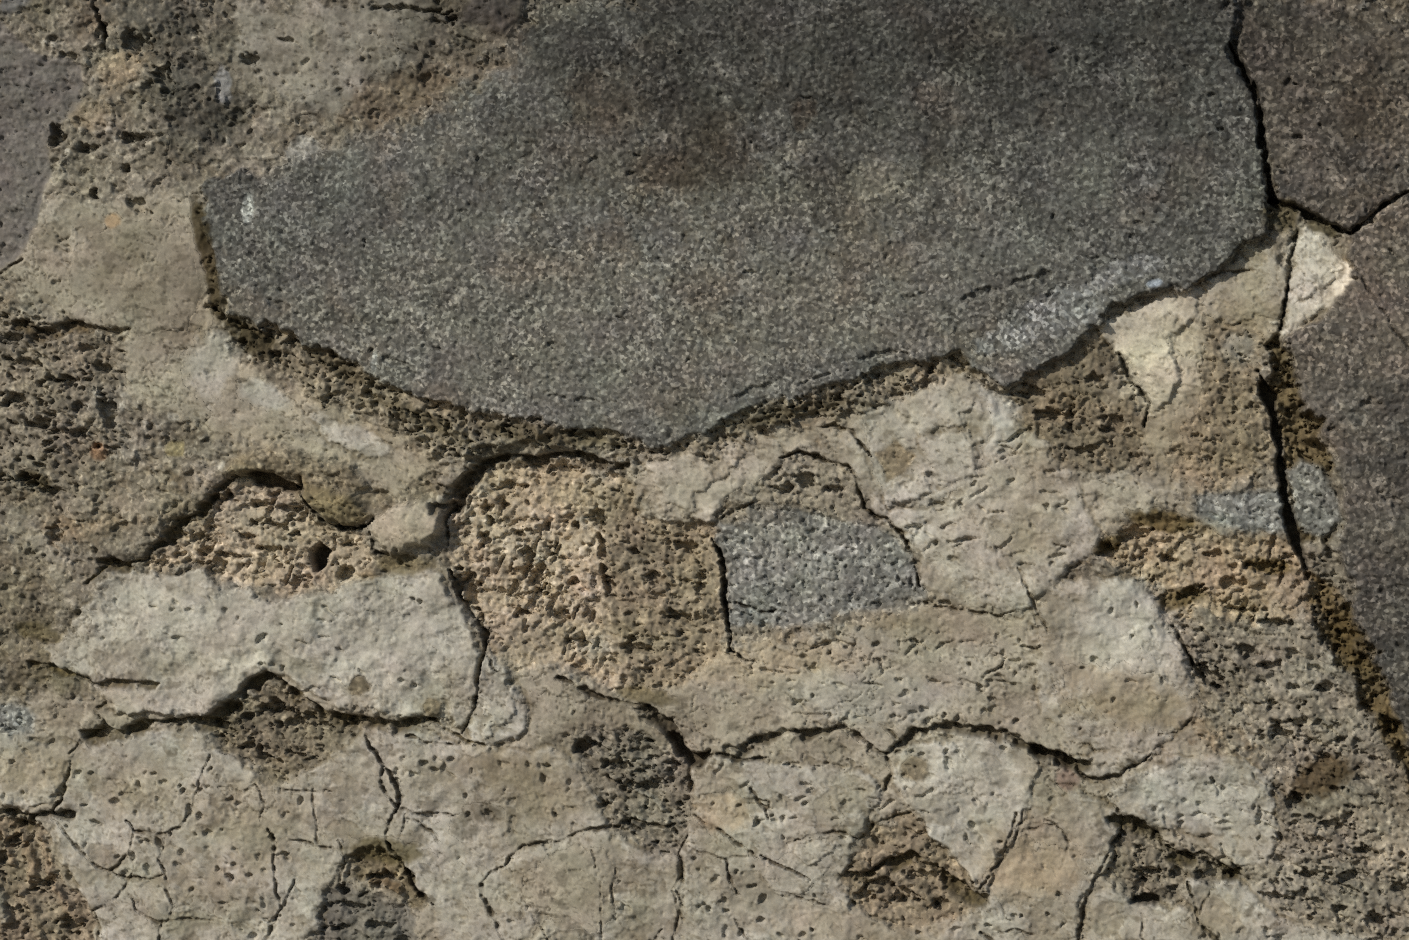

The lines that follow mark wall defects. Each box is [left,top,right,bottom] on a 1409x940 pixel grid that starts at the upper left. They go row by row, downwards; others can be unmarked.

spalling [0,298,131,515]
spalling [204,296,1009,524]
spalling [1165,224,1355,494]
crack [1193,42,1409,716]
spalling [148,475,375,598]
crack [0,451,632,940]
spalling [571,727,694,856]
crack [710,501,787,664]
crack [479,623,1244,940]
spalling [763,811,977,930]
crack [780,420,1049,634]
spalling [1101,523,1409,940]